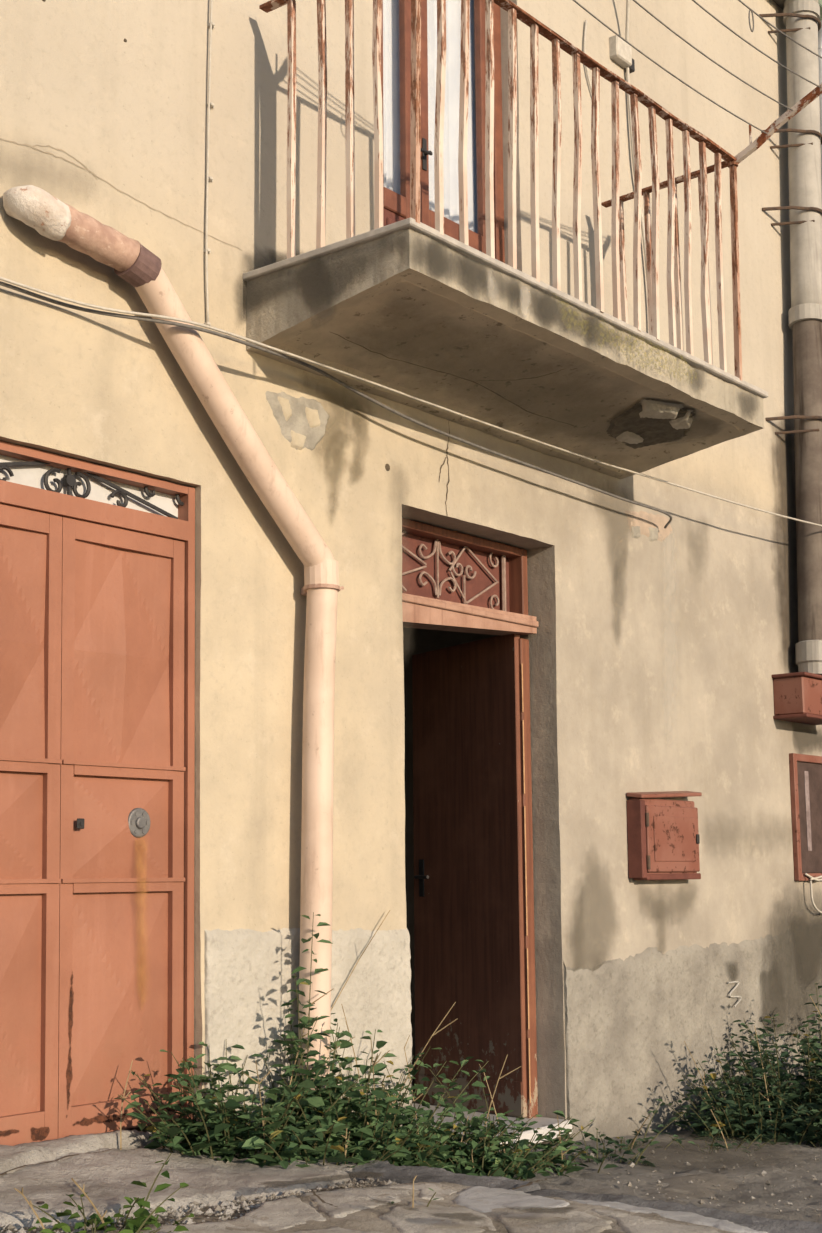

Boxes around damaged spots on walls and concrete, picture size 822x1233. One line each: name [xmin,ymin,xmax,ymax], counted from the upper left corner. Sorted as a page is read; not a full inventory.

crack [0,138,241,250]
leakage [240,236,403,320]
leakage [418,241,617,342]
peeling [265,391,330,451]
spalling [606,399,695,449]
leakage [762,904,822,1032]
corrosion [0,1127,50,1141]